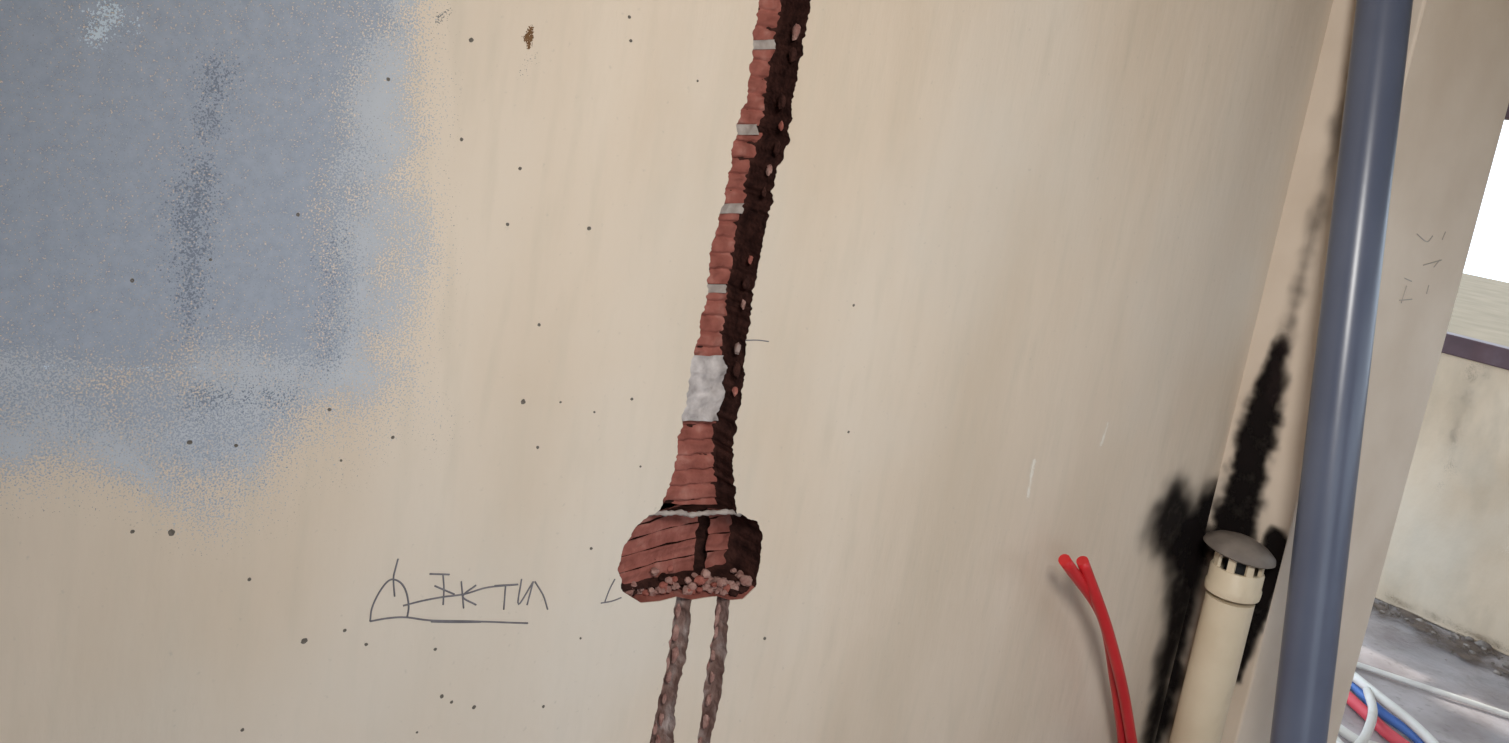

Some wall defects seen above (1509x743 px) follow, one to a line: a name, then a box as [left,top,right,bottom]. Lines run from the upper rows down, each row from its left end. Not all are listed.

water stain [0,0,458,554]